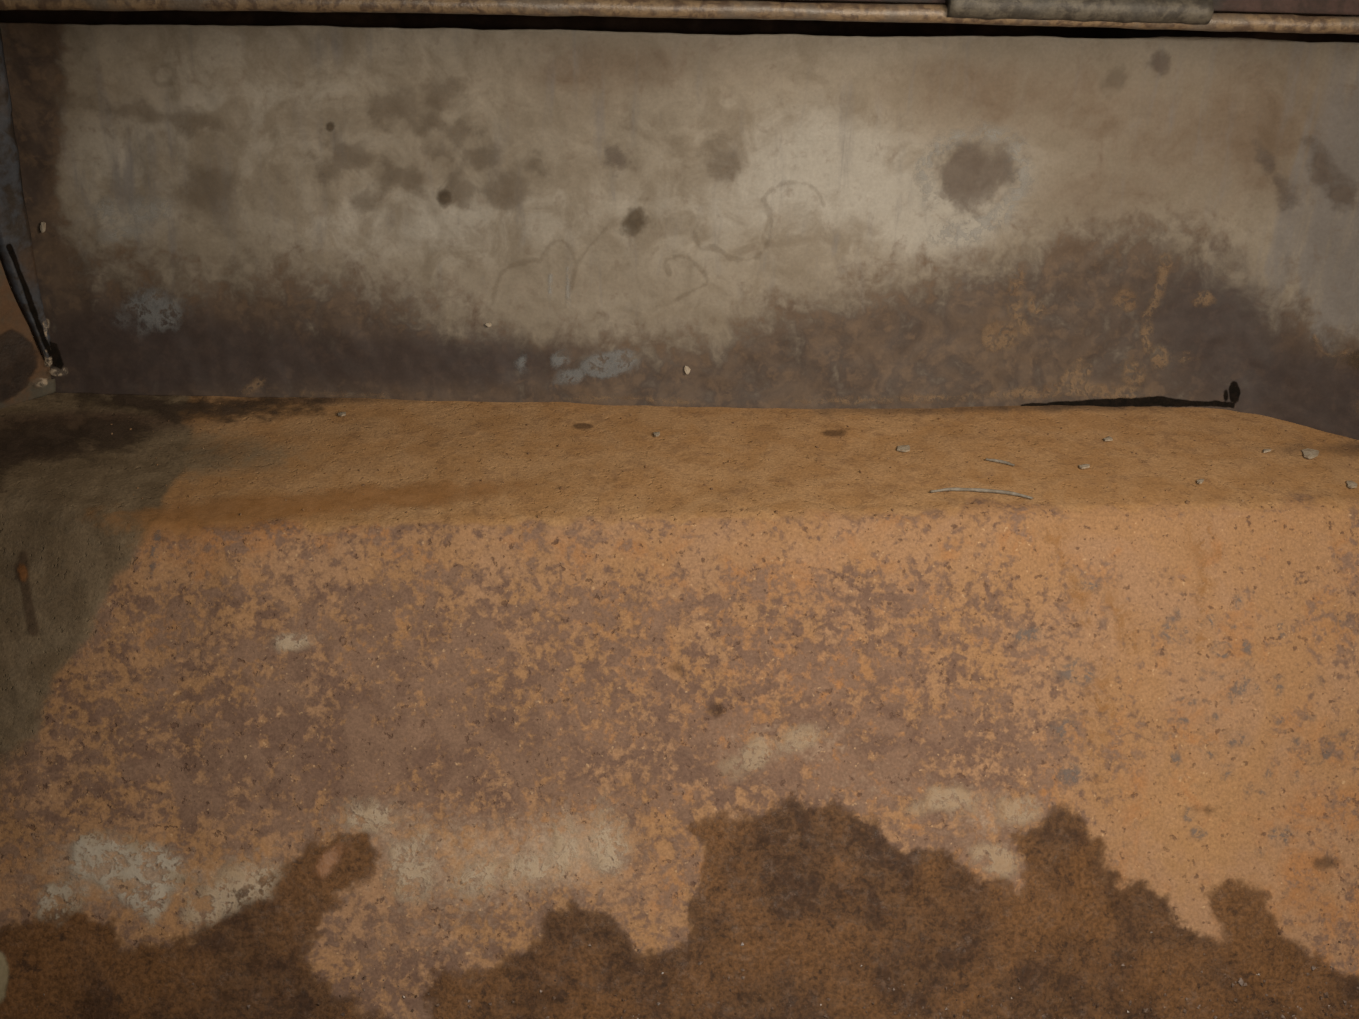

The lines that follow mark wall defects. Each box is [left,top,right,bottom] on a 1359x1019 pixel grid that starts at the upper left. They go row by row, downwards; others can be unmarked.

damp [0,330,37,402]
damp [0,392,321,468]
damp [914,787,972,811]
damp [390,834,433,898]
damp [0,804,391,1019]
damp [424,798,1359,1019]